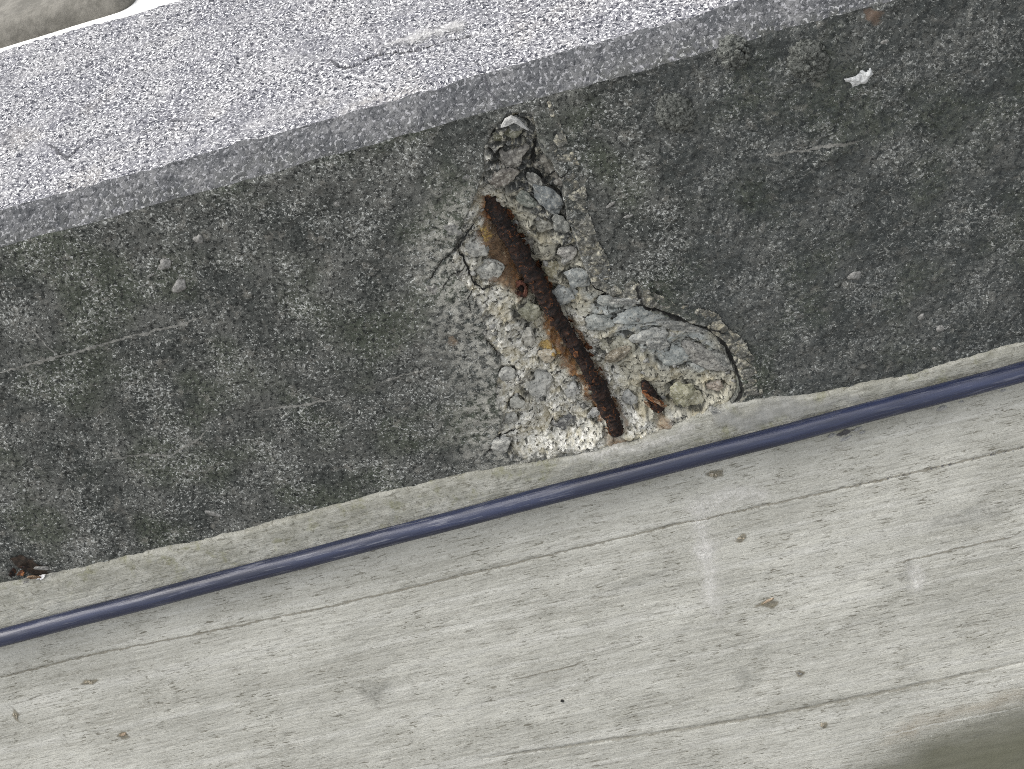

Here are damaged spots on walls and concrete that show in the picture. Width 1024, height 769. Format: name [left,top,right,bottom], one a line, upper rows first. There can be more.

crack [429,222,494,311]
rust [477,195,628,445]
spalling [443,100,763,465]
rust [641,380,671,429]